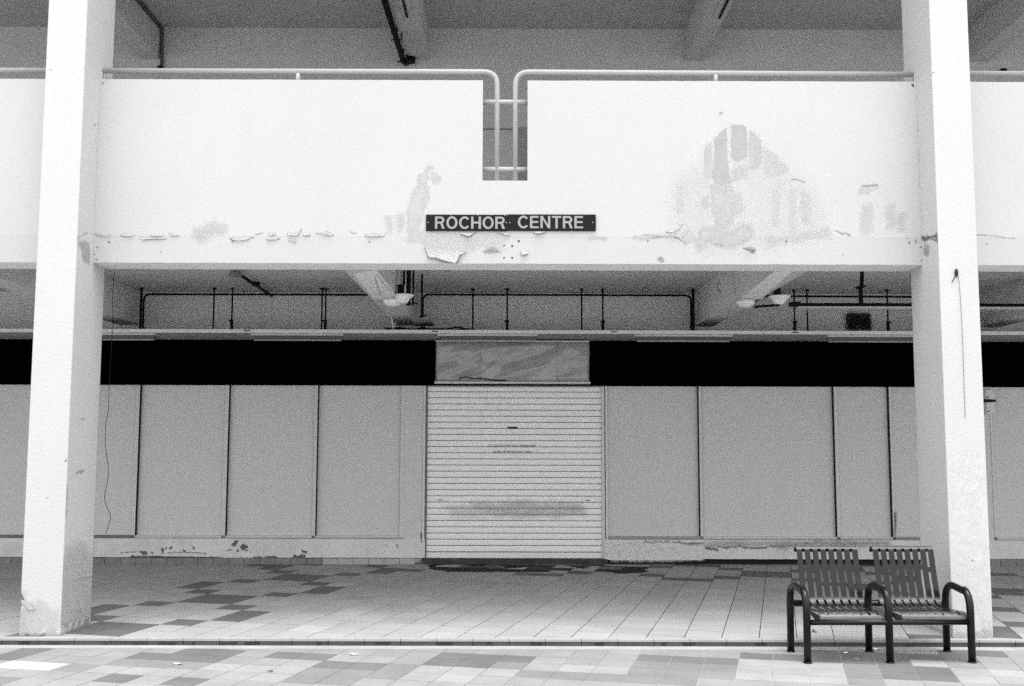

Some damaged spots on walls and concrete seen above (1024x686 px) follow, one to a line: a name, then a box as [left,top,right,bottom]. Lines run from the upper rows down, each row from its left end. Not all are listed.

peeling [423,231,515,263]
peeling [121,540,277,558]